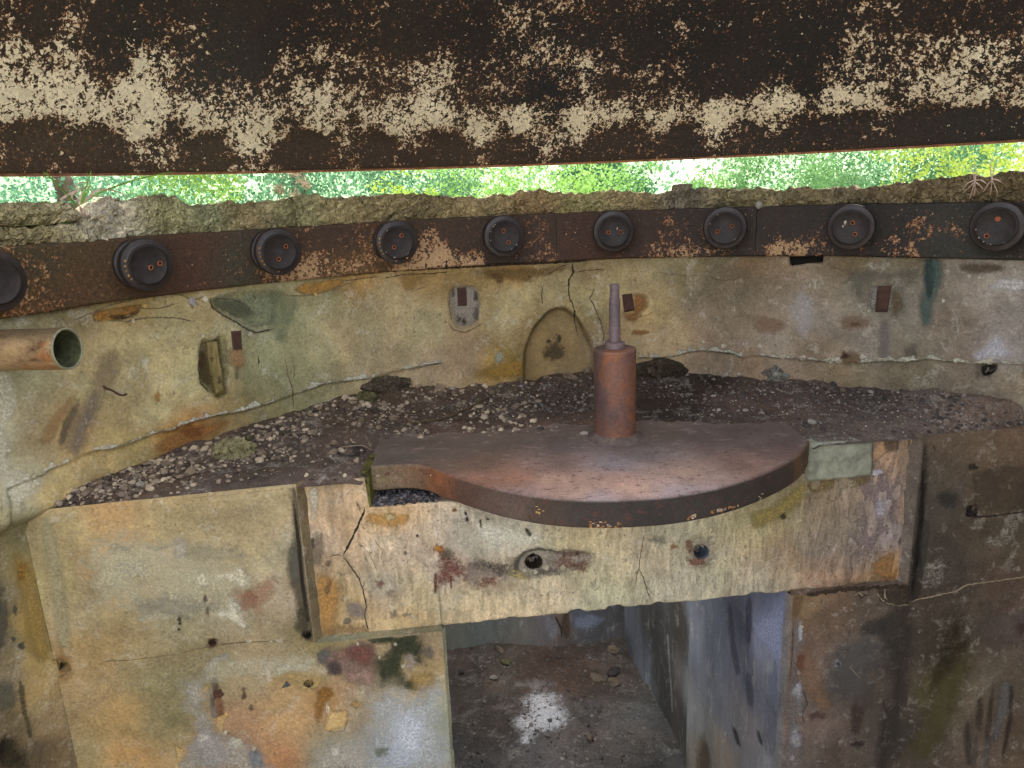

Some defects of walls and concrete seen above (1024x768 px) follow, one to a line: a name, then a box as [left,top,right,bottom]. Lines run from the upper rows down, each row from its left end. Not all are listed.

crack [316,260,605,341]
rust [484,267,564,283]
rust [626,294,647,335]
damp [851,259,945,326]
crack [285,361,295,407]
rust [367,514,408,526]
crack [330,502,383,632]
rust [434,546,469,593]